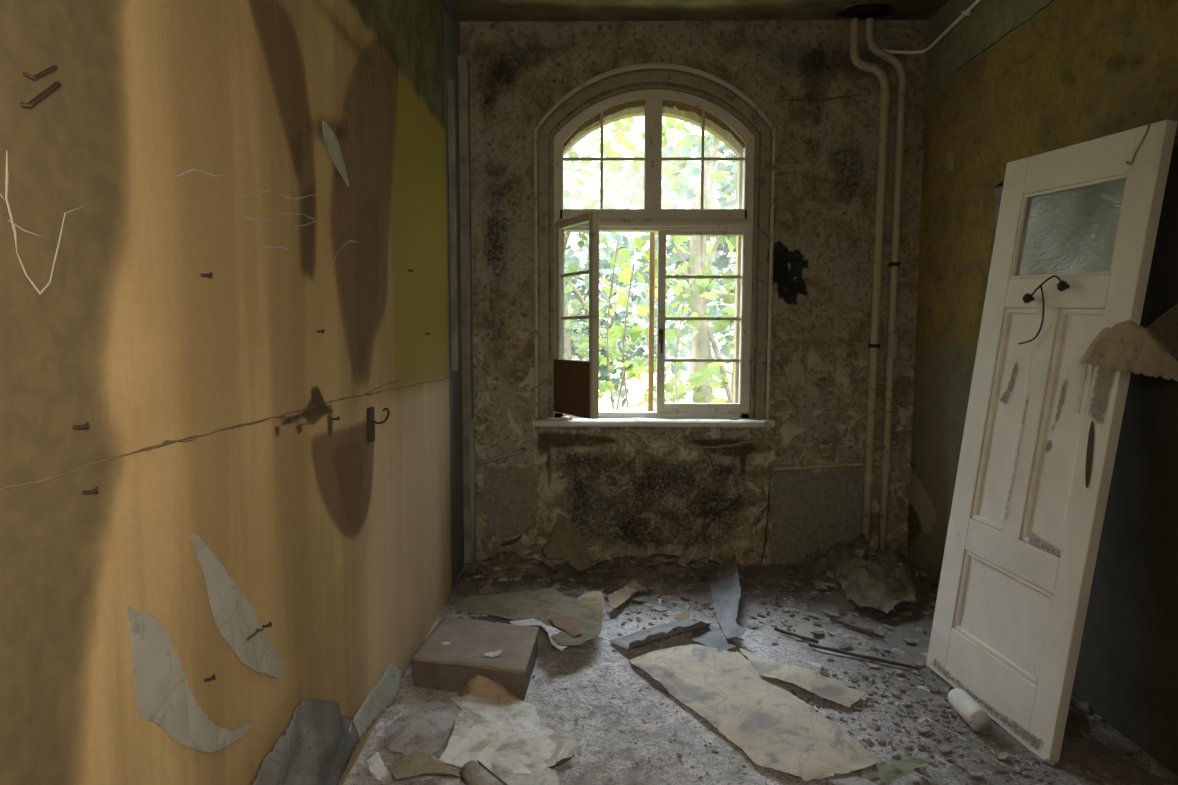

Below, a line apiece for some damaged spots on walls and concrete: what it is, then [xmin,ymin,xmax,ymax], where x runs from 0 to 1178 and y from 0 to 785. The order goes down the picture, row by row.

leakage [767,241,808,305]
peeling [191,533,283,678]
peeling [127,606,252,753]